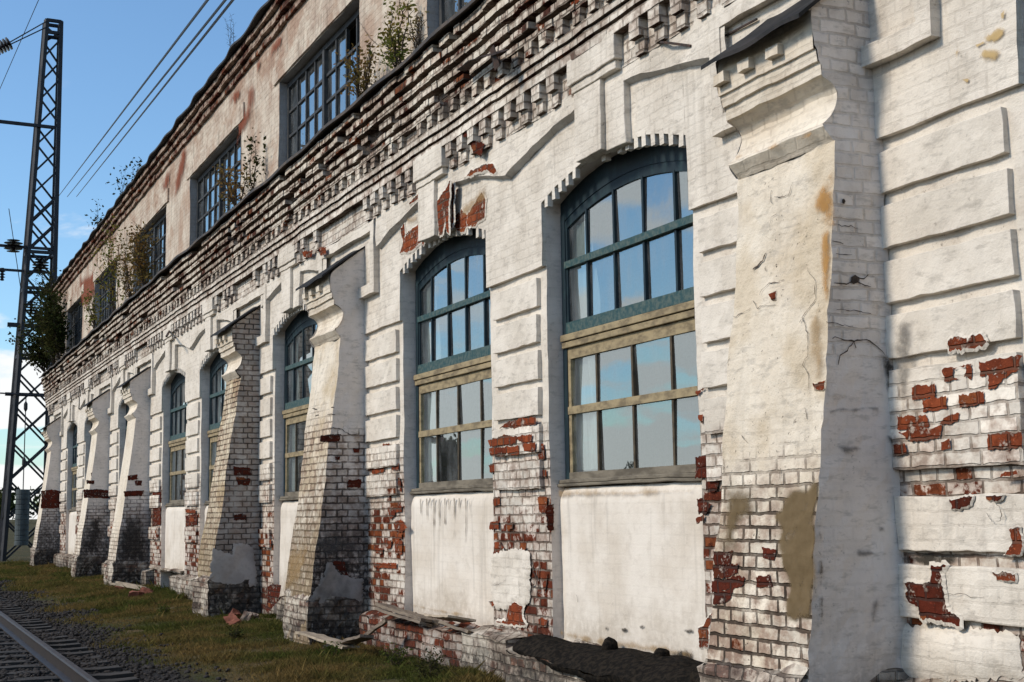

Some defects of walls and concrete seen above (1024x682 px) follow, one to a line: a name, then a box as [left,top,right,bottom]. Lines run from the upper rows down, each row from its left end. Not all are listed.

peeling [437,132,498,238]
peeling [400,222,425,255]
crack [733,253,781,317]
crack [800,267,885,417]
flaking render [893,331,1022,456]
flaking render [488,417,546,478]
spalling [538,495,554,531]
flaking render [695,455,719,524]
spalling [949,494,1005,511]
spalling [1004,525,1024,557]
flaking render [698,550,773,650]
spalling [903,560,964,631]